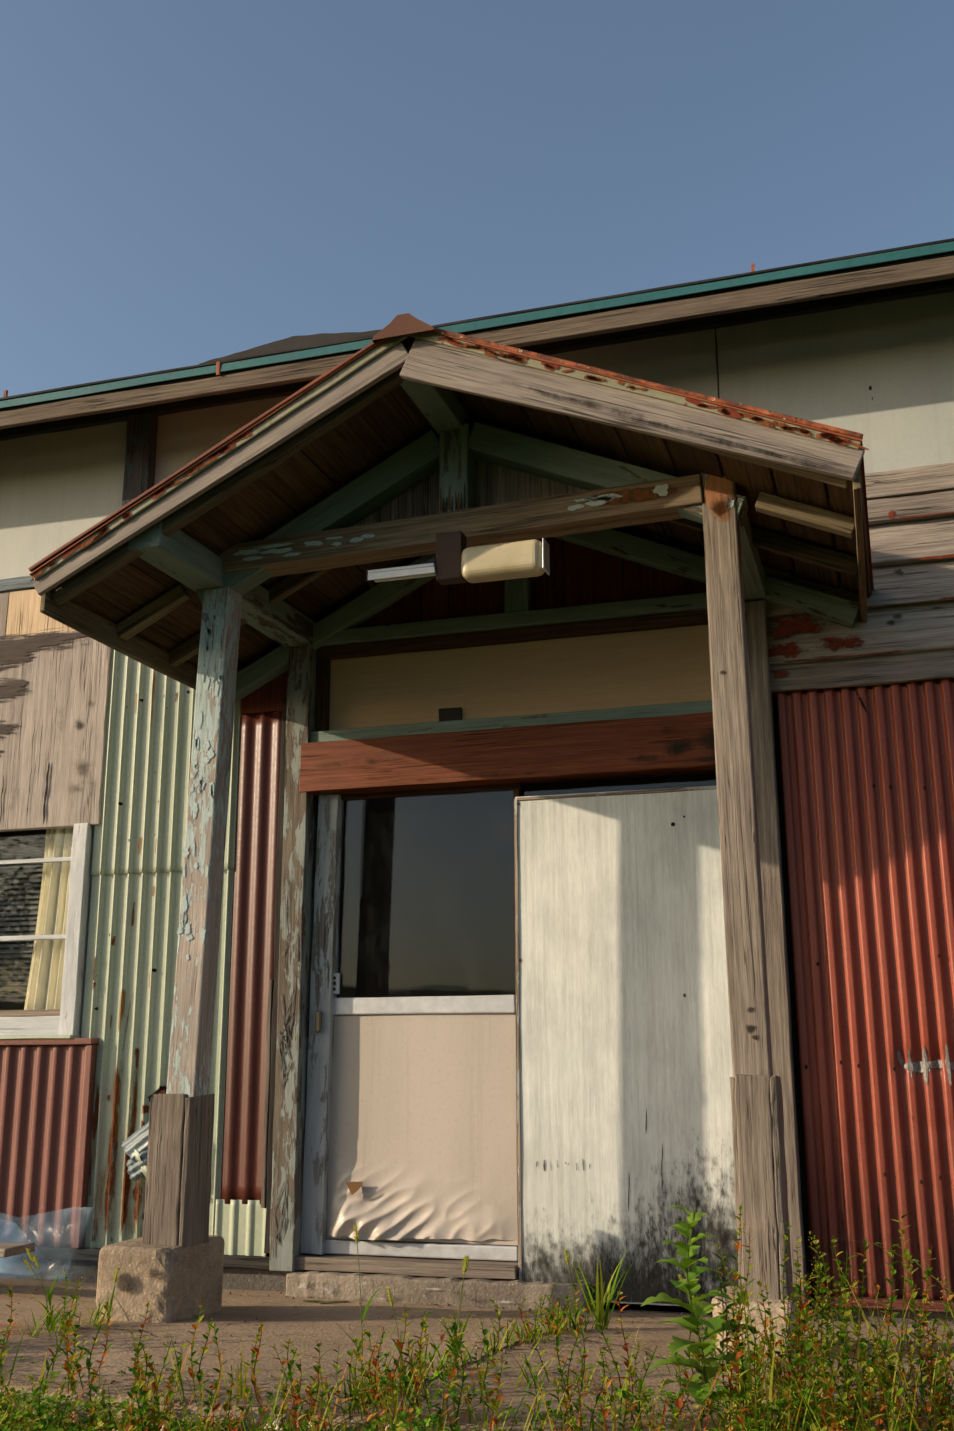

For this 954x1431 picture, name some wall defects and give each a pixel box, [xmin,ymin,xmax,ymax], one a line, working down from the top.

rust [437,337,647,391]
rust [685,398,869,450]
rust [151,429,252,499]
rust [33,526,108,579]
peeling [767,610,900,677]
rust [135,674,189,725]
peeling [190,602,224,819]
peeling [177,839,208,961]
peeling [279,894,299,1088]
rust [89,990,149,1241]
leakage [522,1149,739,1304]